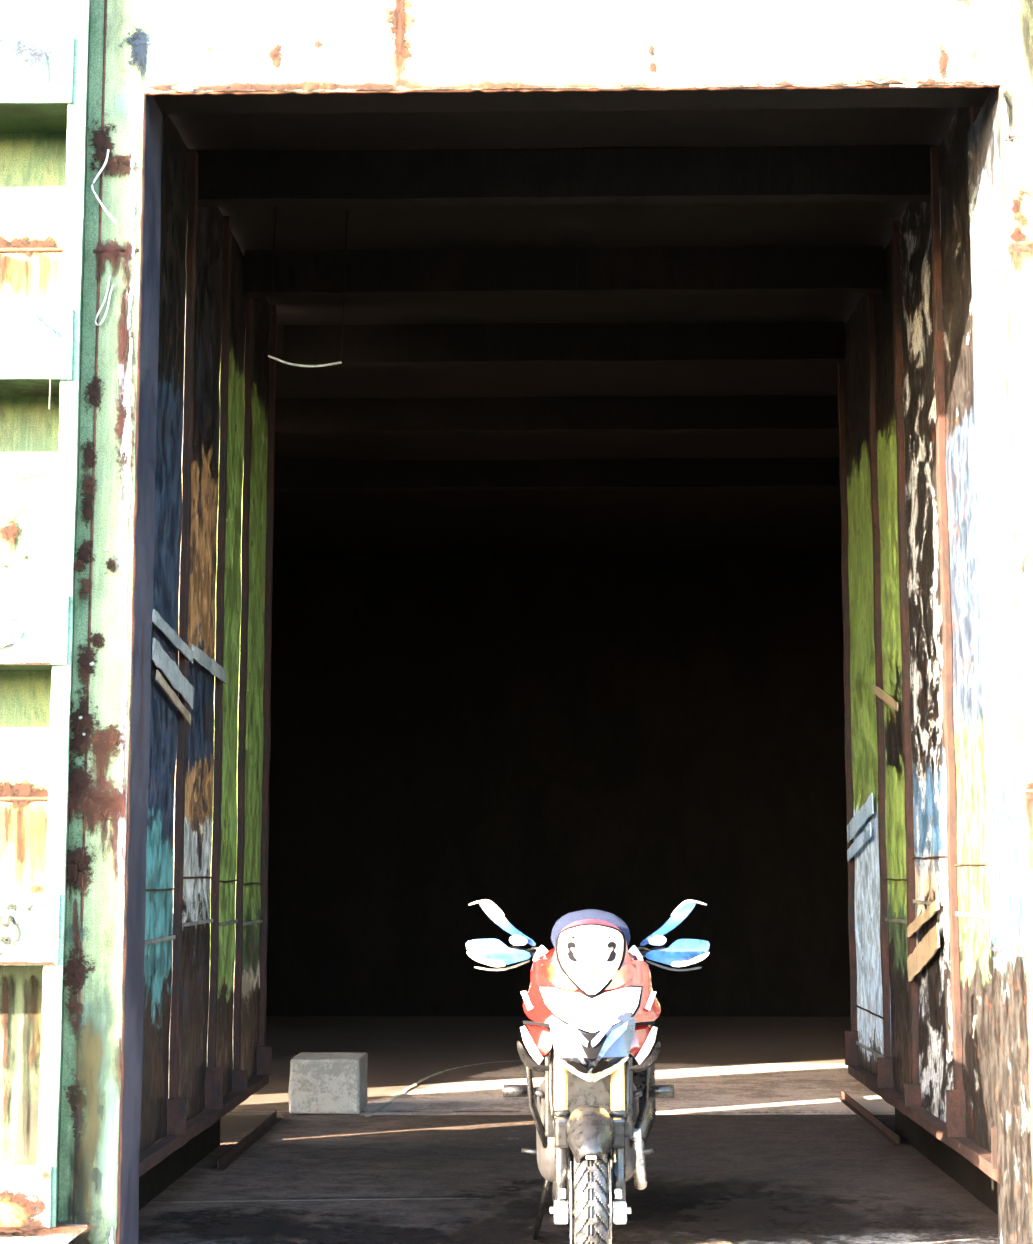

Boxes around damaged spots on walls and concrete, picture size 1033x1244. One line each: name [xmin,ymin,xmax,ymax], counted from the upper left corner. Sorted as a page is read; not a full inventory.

rust [147,0,993,91]
rust [87,115,139,178]
rust [0,234,57,301]
rust [96,240,133,291]
rust [1007,189,1033,272]
rust [84,366,105,411]
rust [74,439,120,604]
rust [0,632,126,1040]
rust [1024,780,1033,888]
rust [63,1037,121,1244]
rust [0,1168,89,1238]